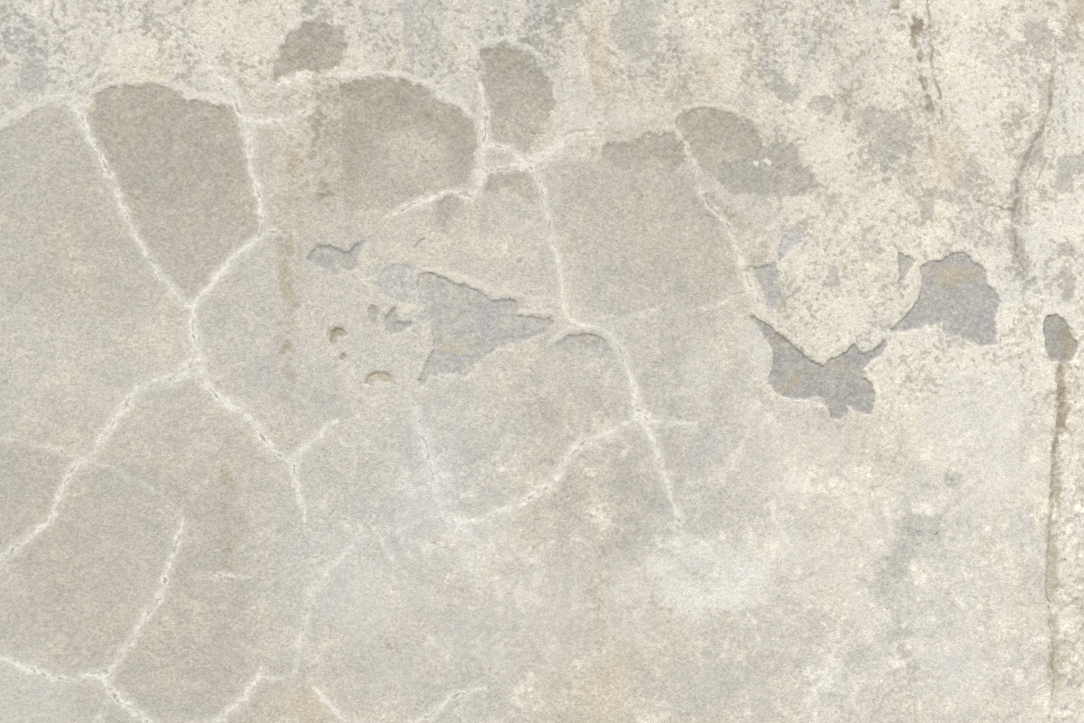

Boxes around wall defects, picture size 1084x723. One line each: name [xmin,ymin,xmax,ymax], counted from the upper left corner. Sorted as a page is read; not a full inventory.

peeling [269,13,478,249]
crack [0,0,754,723]
peeling [470,35,557,154]
peeling [306,101,818,389]
crack [674,125,784,327]
spalling [749,223,1002,420]
spalling [1042,314,1079,364]
water stain [304,319,1062,723]